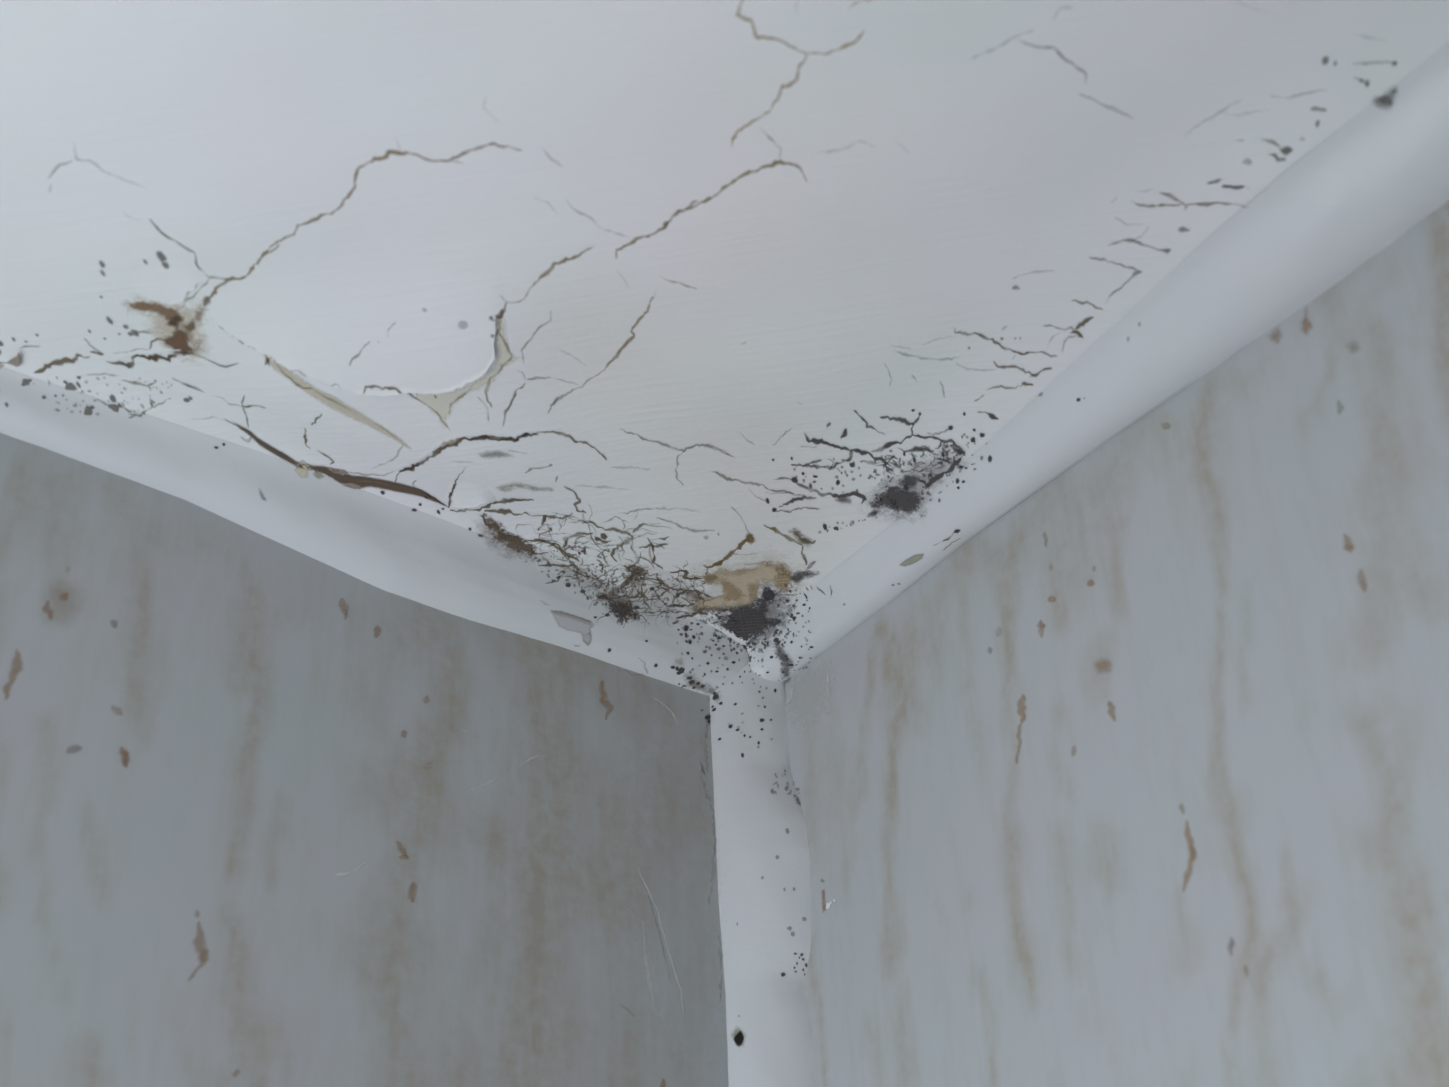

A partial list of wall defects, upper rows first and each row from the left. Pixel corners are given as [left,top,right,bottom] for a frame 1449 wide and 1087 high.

crack [1025,43,1086,85]
crack [1269,144,1292,161]
crack [0,142,521,428]
crack [393,0,865,516]
crack [954,179,1244,420]
crack [303,414,334,465]
peeling [265,355,406,446]
leakage [766,409,992,532]
leakage [468,513,832,758]